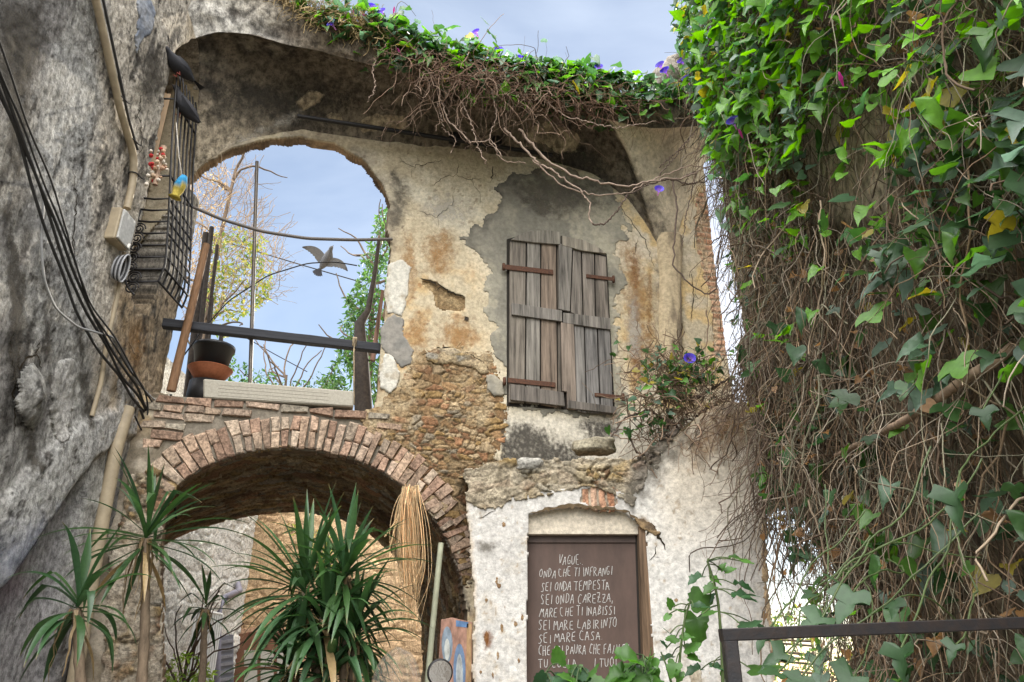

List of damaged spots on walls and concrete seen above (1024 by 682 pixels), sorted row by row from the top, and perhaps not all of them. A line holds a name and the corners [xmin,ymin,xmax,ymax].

crack [400,158,496,227]
corrosion [431,233,453,270]
flaking render [384,260,412,317]
flaking render [422,281,469,321]
flaking render [426,348,489,374]
flaking render [463,428,680,536]